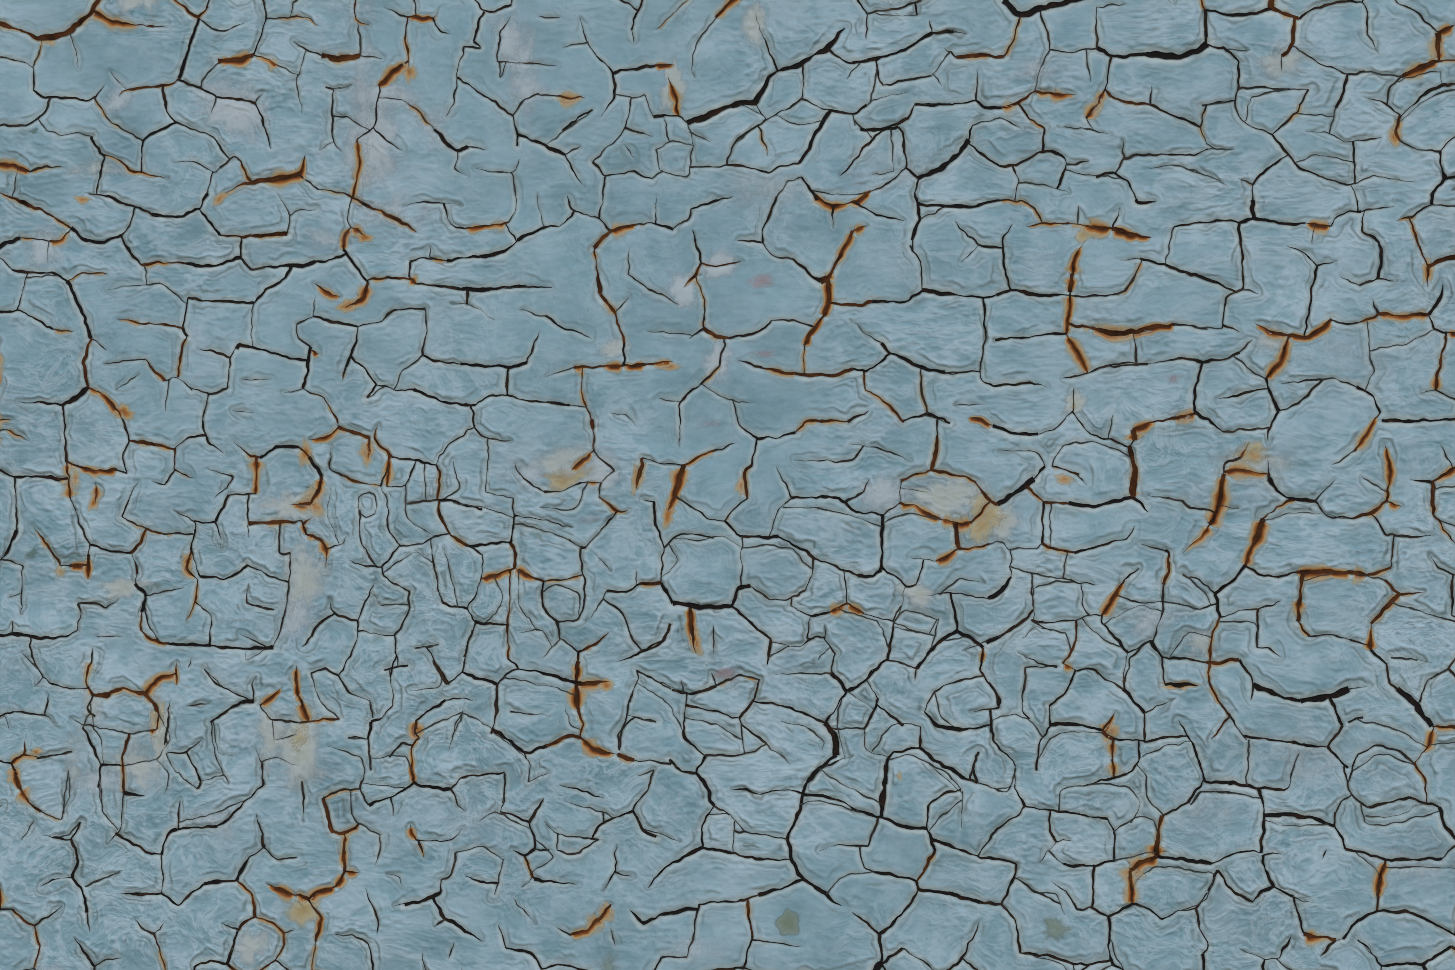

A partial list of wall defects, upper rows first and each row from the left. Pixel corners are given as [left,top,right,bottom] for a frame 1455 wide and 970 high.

crack [447,0,593,184]
crack [566,17,966,201]
crack [931,0,1455,200]
crack [0,0,556,580]
rust [802,191,870,346]
rust [1063,218,1174,373]
rust [662,468,689,528]
rust [1187,442,1267,550]
crack [134,553,291,660]
rust [566,665,614,710]
crack [0,599,297,970]
rust [268,836,358,940]